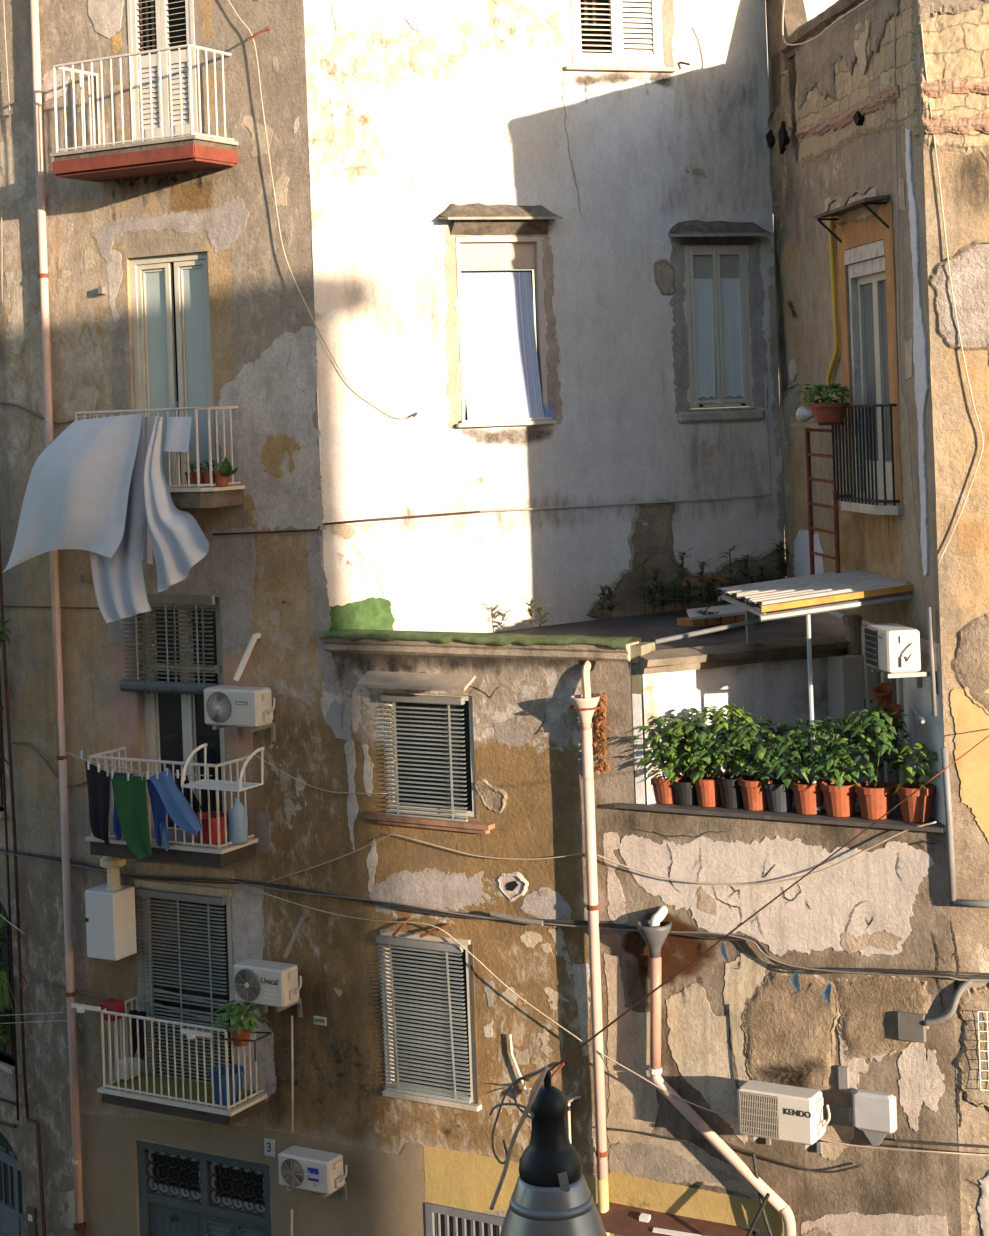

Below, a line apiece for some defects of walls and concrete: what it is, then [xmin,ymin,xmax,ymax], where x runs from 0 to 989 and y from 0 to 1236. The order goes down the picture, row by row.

peeling [293,0,567,185]
flaking render [766,0,989,228]
flaking render [928,239,989,366]
peeling [217,325,374,584]
flaking render [586,499,794,620]
peeling [950,612,989,842]
peeling [483,980,526,1038]
flaking render [496,872,529,902]
peeling [496,1092,532,1150]
peeling [520,926,768,1202]
corrosion [623,913,713,1004]
flaking render [603,832,989,1161]